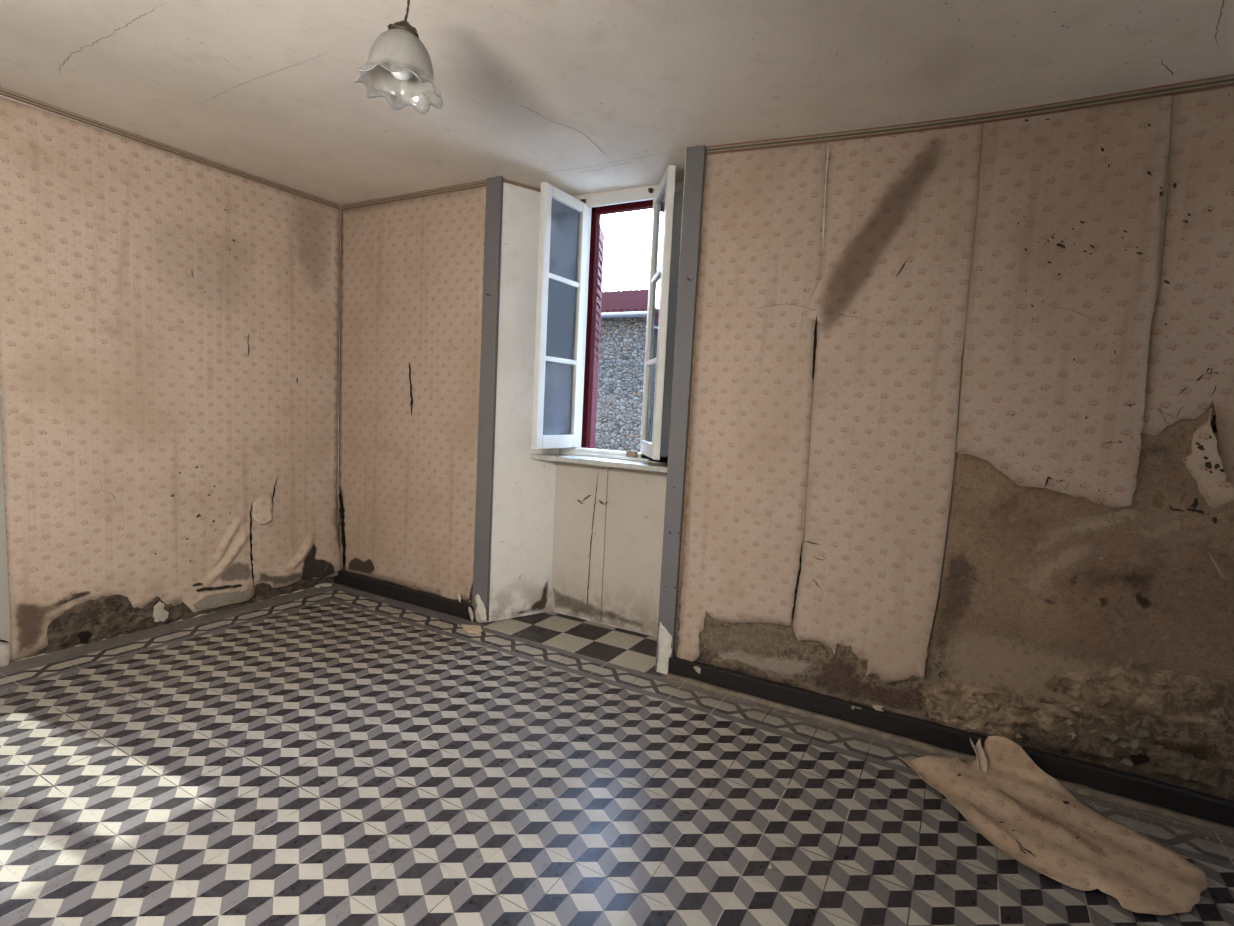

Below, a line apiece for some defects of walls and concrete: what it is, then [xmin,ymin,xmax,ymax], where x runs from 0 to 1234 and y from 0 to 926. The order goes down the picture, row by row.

crack [1215,0,1224,49]
water stain [826,158,931,319]
peeling [1182,407,1234,509]
flaking render [0,577,334,667]
flaking render [693,656,1226,793]